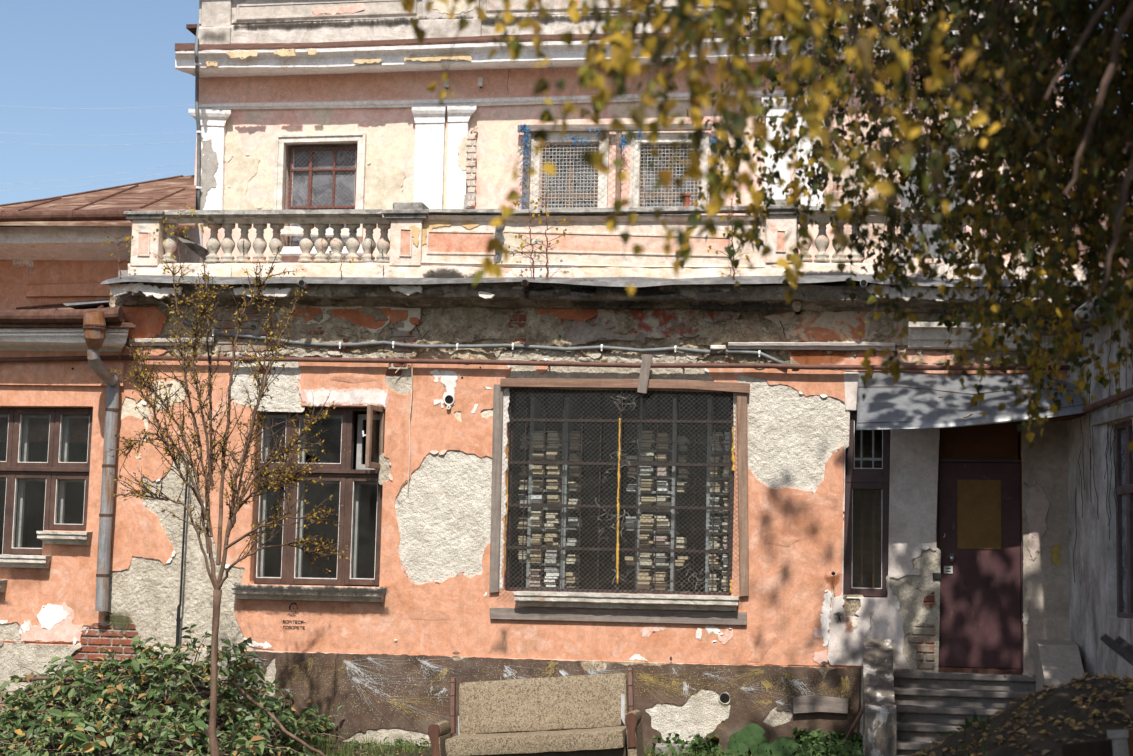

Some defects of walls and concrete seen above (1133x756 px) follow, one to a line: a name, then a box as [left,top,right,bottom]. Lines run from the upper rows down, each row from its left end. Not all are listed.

peeling [200,139,273,210]
spalling [121,380,186,459]
spalling [190,305,850,597]
spalling [0,454,276,713]
peeling [813,590,872,679]
spalling [886,546,941,672]
spalling [645,689,730,743]